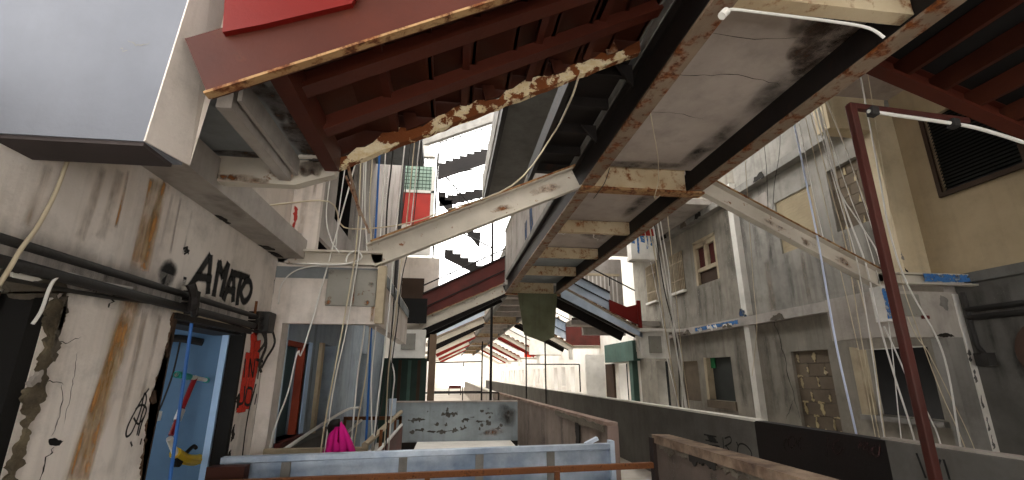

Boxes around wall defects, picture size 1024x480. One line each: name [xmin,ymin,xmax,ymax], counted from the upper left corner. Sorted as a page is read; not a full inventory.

crack [684,74,778,84]
water stain [788,17,859,81]
rust [134,180,166,270]
flaking render [0,269,69,480]
rust [71,317,128,475]
peeling [408,407,514,434]